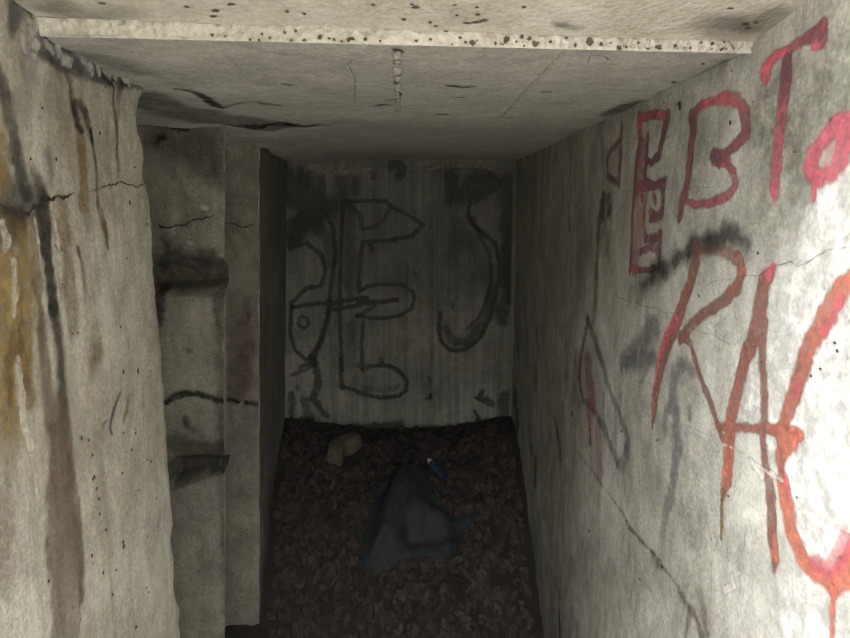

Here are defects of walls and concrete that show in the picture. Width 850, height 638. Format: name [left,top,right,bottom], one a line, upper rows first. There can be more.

crack [176,89,301,129]
damp [0,68,42,259]
rust [0,200,43,439]
damp [52,214,62,291]
crack [1,181,145,394]
damp [156,247,229,326]
crack [159,215,254,237]
damp [18,372,34,456]
damp [36,325,84,638]